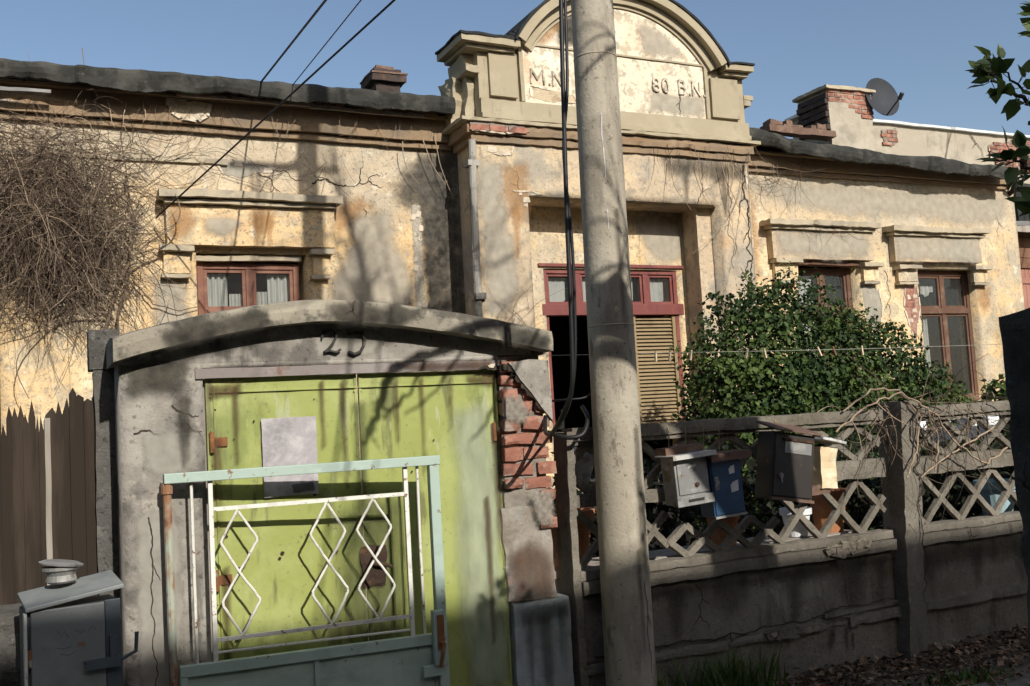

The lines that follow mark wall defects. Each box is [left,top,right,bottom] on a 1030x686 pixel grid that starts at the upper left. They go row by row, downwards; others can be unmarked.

flaking render [880,128,898,147]
flaking render [988,140,1030,175]
crack [257,164,381,217]
flaking render [903,285,921,344]
peeling [508,359,553,420]
damp [355,404,367,527]
spalling [824,538,872,559]
crack [148,517,161,686]
crack [644,584,895,671]